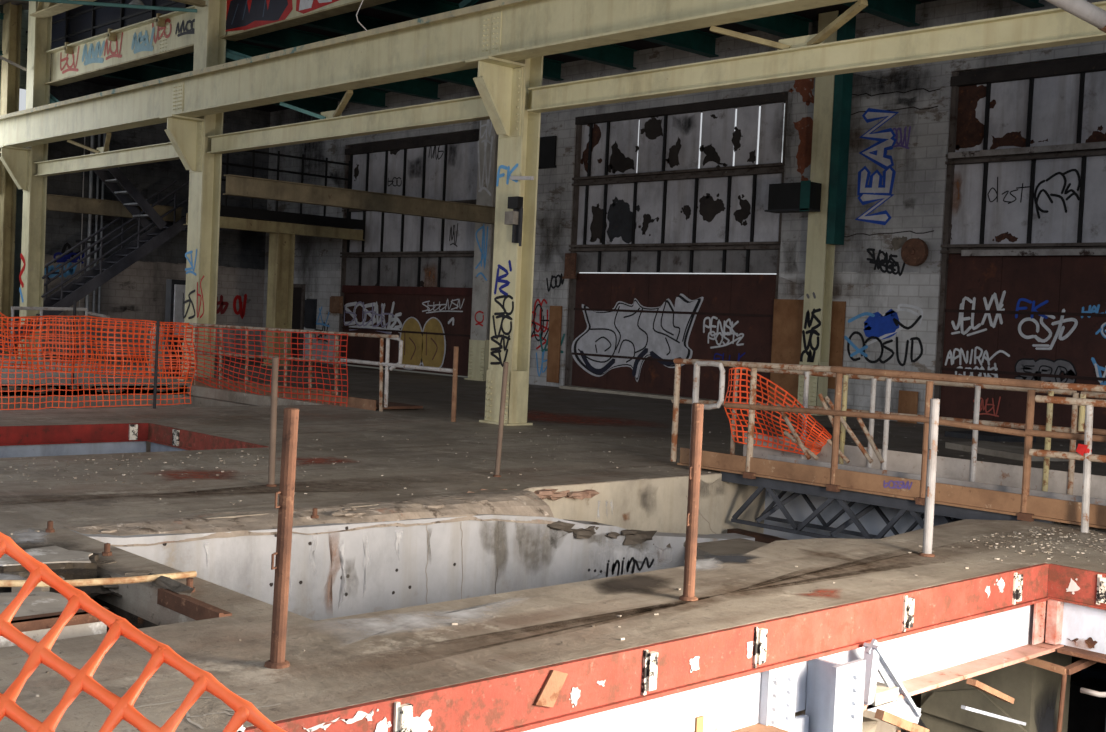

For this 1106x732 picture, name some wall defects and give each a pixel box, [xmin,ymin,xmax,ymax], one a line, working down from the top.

leakage [486,527,507,571]
leakage [327,544,350,603]
leakage [594,543,671,593]
leakage [696,554,756,569]
peeling [985,577,1005,597]
peeling [1066,578,1080,595]
leakage [343,603,496,634]
peeling [689,656,700,673]
peeling [569,687,581,707]
peeling [303,709,392,732]
peeling [412,709,433,732]